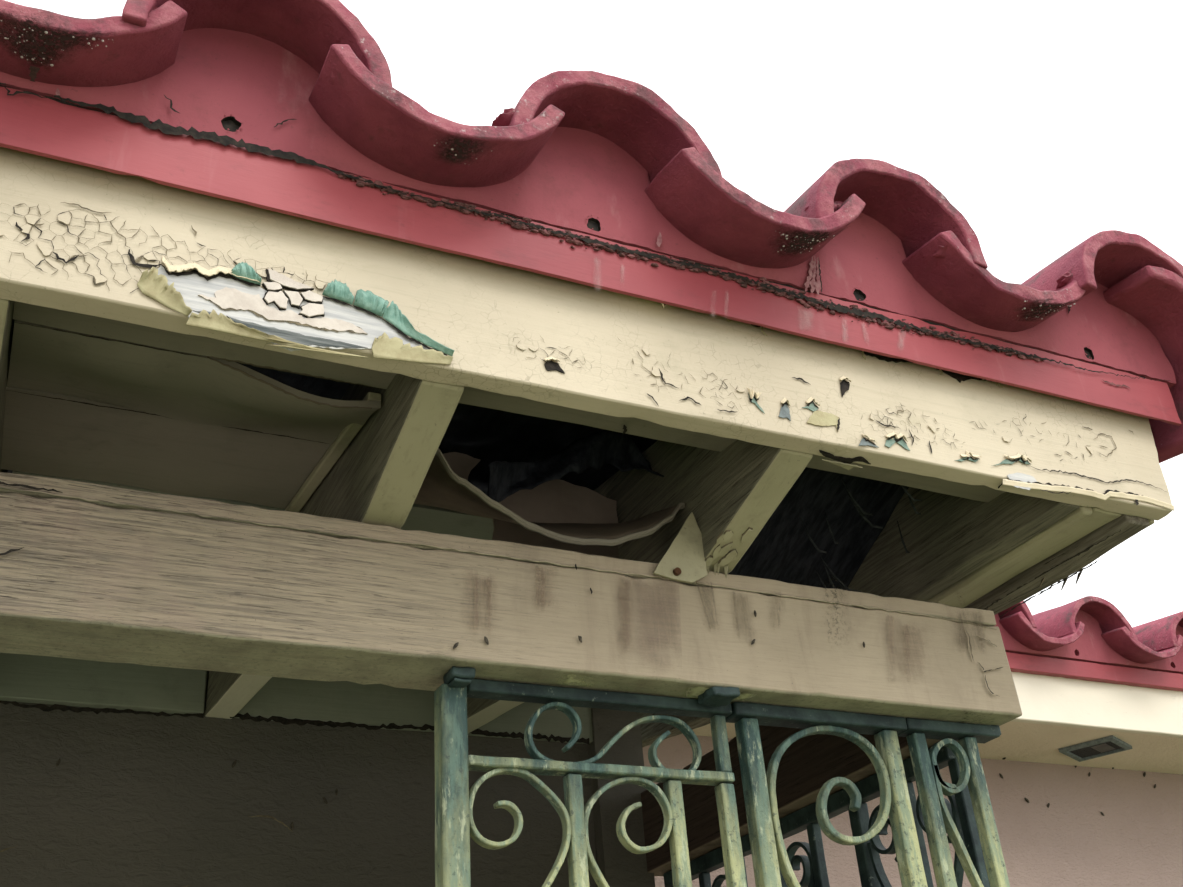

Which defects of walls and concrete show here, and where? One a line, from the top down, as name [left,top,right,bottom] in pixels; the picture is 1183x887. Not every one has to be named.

leakage [0,10,102,66]
crack [0,66,1170,388]
leakage [779,231,830,295]
peeling [137,256,455,365]
leakage [1023,298,1077,321]
crack [617,337,753,412]
peeling [747,387,840,432]
peeling [839,376,851,397]
peeling [819,432,910,470]
crack [861,403,1174,511]